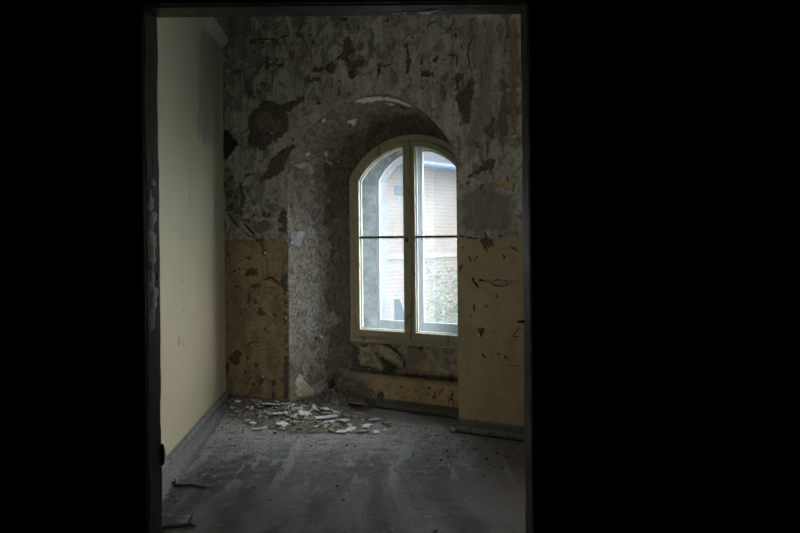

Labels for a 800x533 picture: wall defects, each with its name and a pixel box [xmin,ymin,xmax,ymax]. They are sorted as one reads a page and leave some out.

peeling [305,24,365,95]
spalling [355,96,412,110]
peeling [402,33,475,127]
peeling [465,113,497,186]
peeling [147,179,159,331]
crack [228,213,257,238]
spalling [223,17,347,400]
spalling [351,342,406,371]